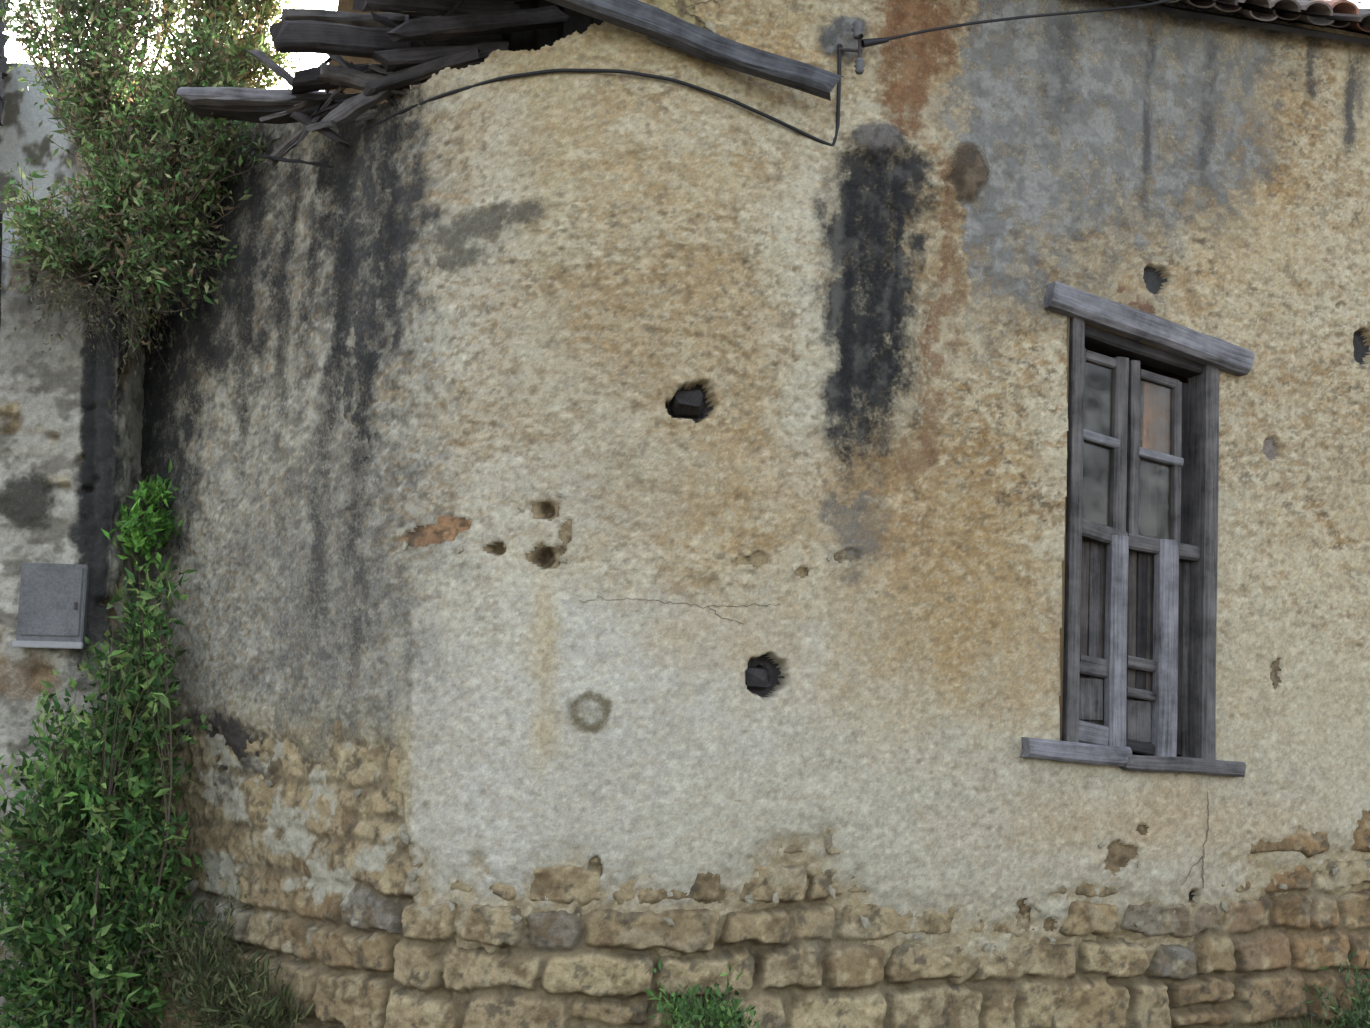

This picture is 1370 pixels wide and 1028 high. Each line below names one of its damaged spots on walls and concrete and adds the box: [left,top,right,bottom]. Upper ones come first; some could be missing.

corrosion [873,0,967,140]
water stain [1342,54,1363,144]
water stain [939,0,1294,318]
water stain [815,142,937,461]
water stain [68,87,544,771]
spalling [665,384,714,423]
spalling [399,516,472,554]
spalling [517,490,572,569]
crack [579,597,780,624]
spalling [745,655,785,697]
spalling [1098,825,1149,876]
crack [1182,791,1209,888]